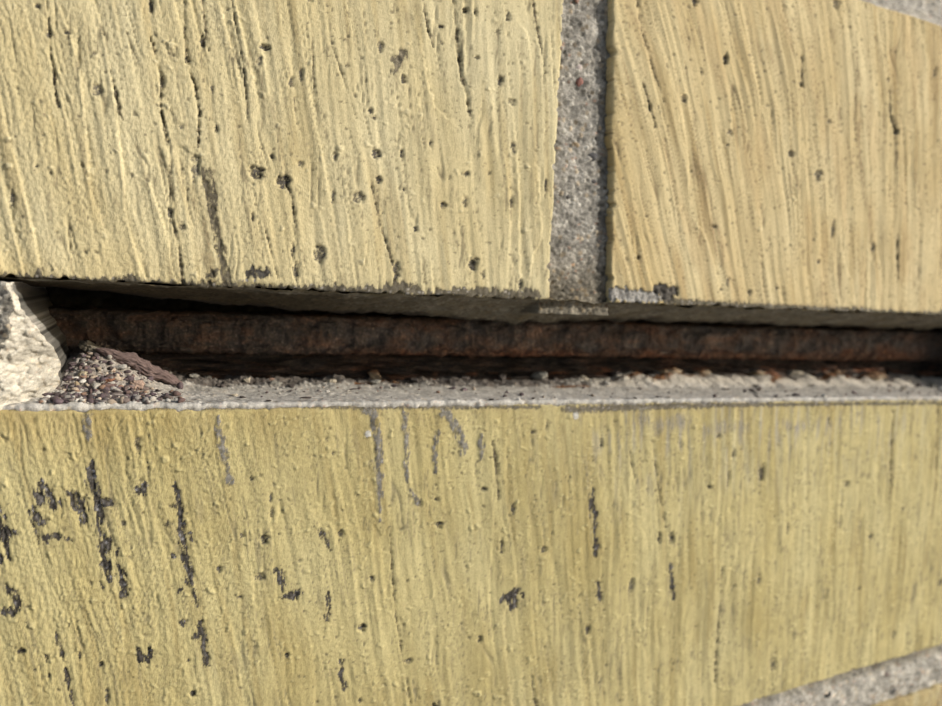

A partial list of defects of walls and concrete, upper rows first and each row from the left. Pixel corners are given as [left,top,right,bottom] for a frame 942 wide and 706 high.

spalling [0,282,61,410]
corrosion [817,372,866,380]